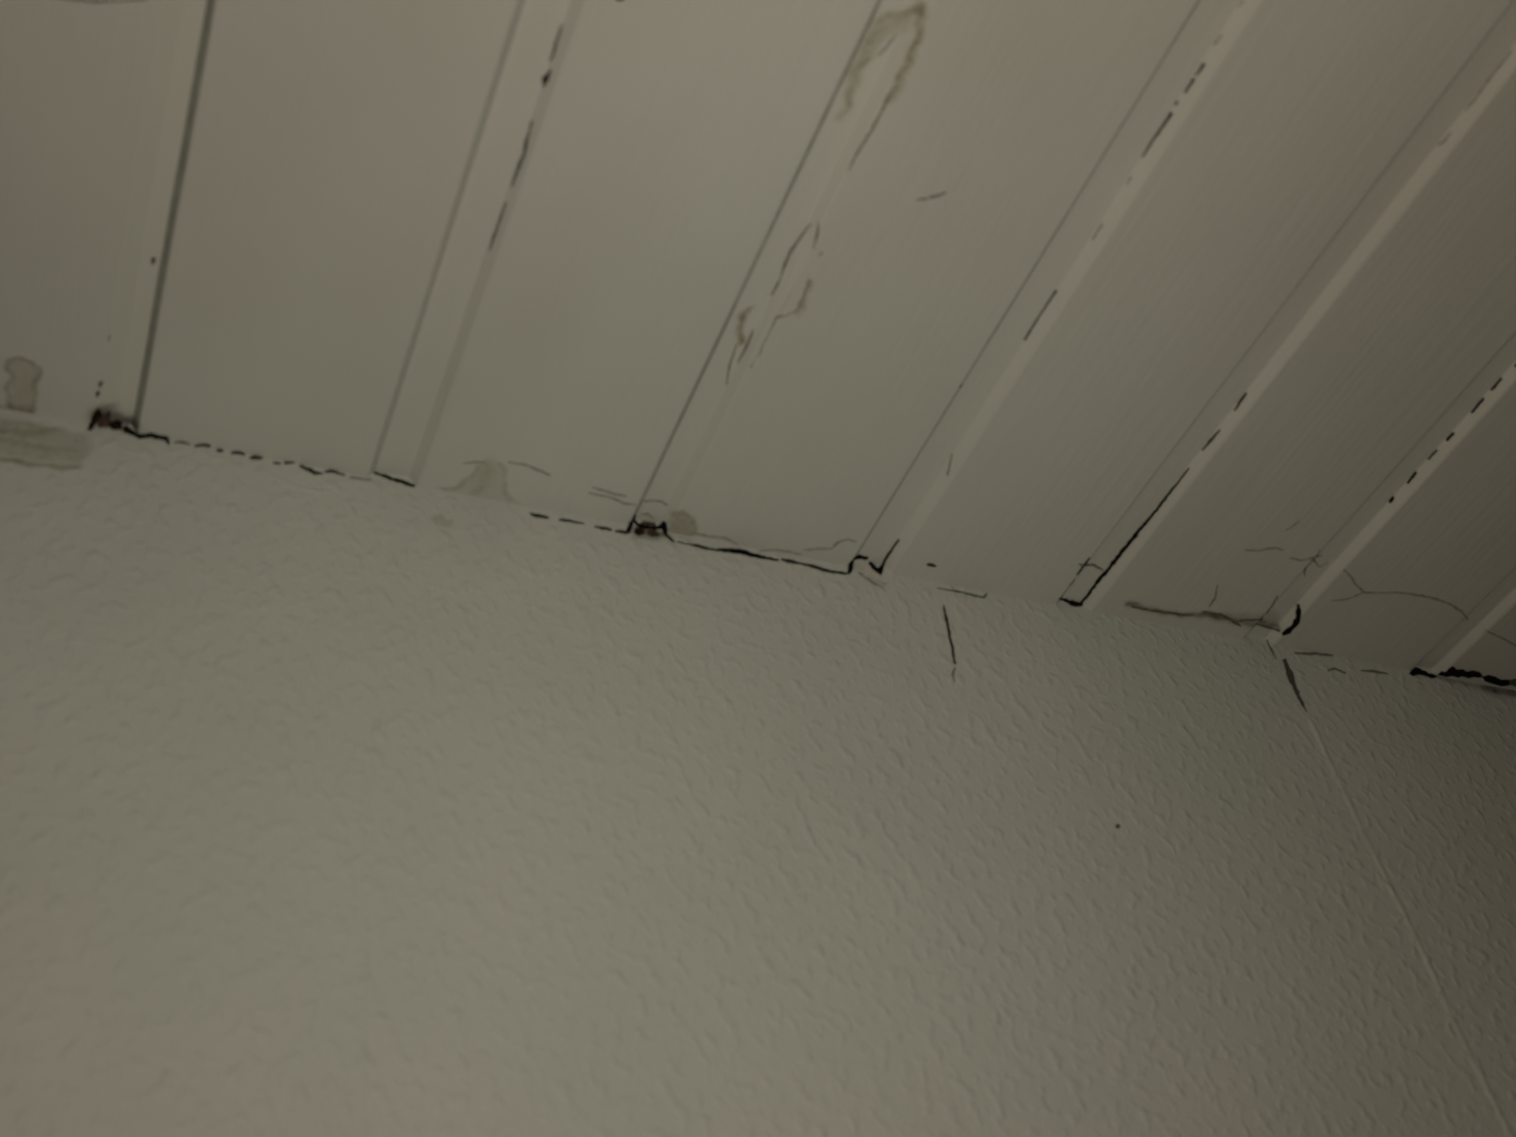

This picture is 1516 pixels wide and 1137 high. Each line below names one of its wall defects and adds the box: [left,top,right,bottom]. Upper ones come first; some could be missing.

crack [135,433,415,487]
crack [463,461,551,476]
crack [530,487,900,575]
crack [937,588,988,682]
crack [1131,520,1516,712]